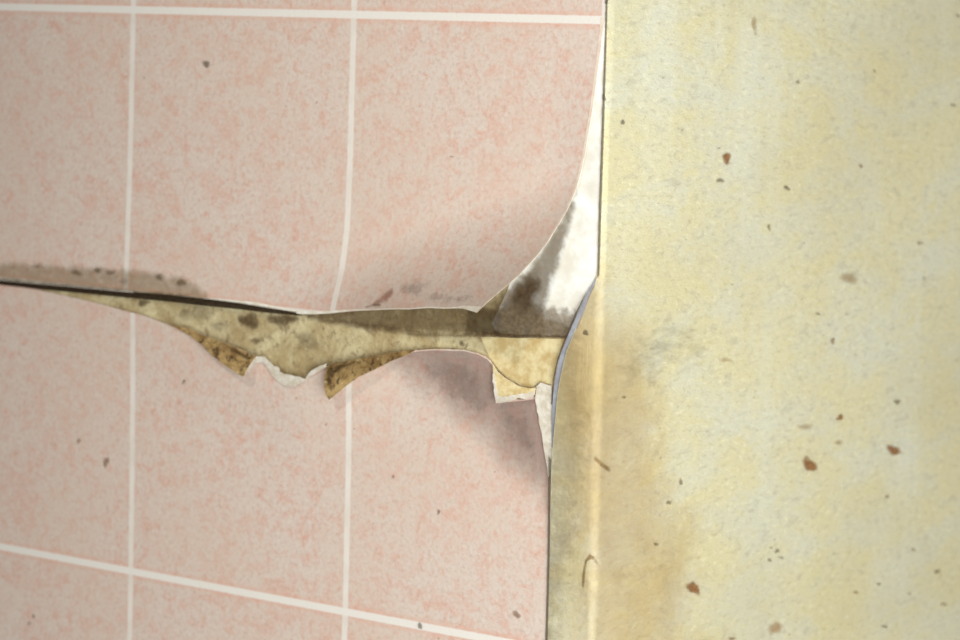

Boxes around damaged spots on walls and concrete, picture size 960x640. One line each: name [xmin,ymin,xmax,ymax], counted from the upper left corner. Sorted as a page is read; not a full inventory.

flaking render [37,285,567,403]